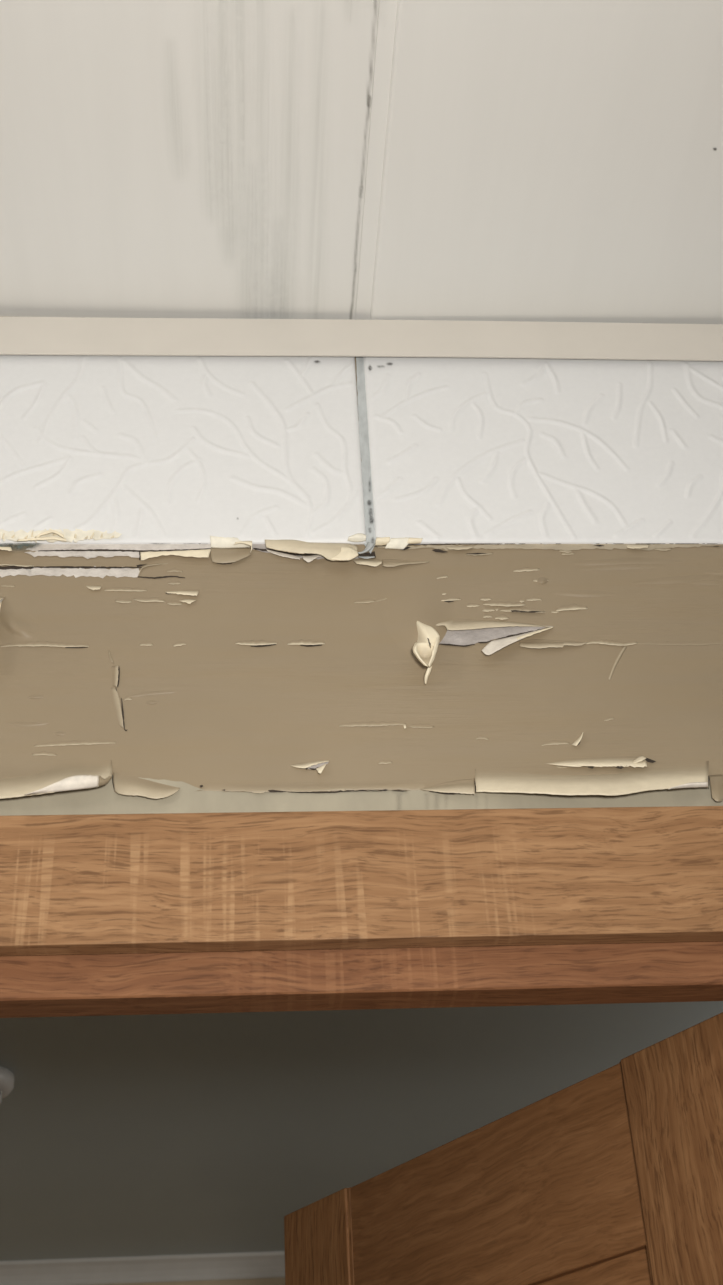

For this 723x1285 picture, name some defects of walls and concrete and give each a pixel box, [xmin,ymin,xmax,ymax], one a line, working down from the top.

peeling [0,530,722,684]
peeling [0,759,180,799]
peeling [200,732,723,802]